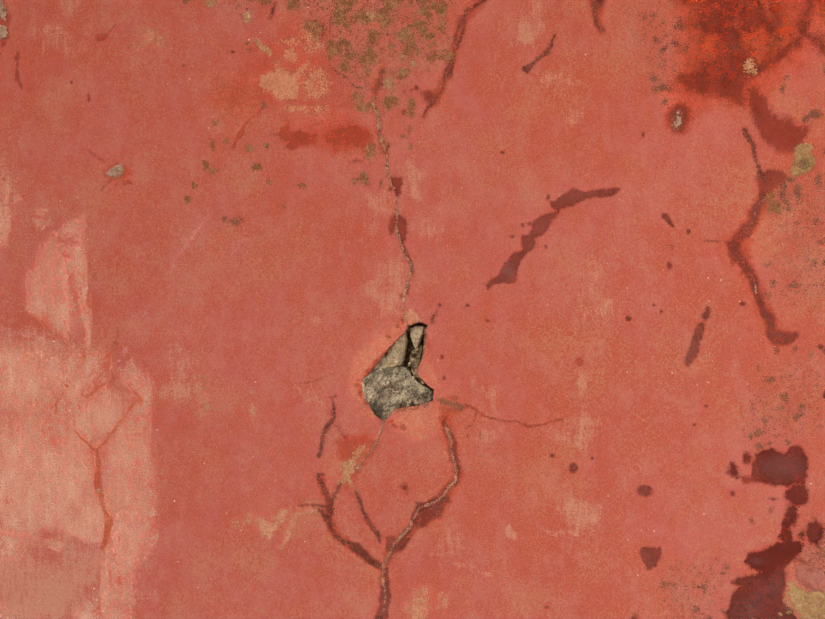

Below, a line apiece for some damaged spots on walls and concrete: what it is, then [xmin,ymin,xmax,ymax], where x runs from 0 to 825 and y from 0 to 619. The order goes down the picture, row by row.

spalling [0,0,8,46]
peeling [252,29,333,115]
crack [423,0,486,117]
crack [592,0,604,32]
water stain [632,1,689,105]
water stain [743,59,758,76]
water stain [802,109,824,122]
spalling [106,163,124,178]
crack [330,65,413,322]
crack [725,128,798,345]
flaking render [350,309,441,442]
crack [298,395,563,619]